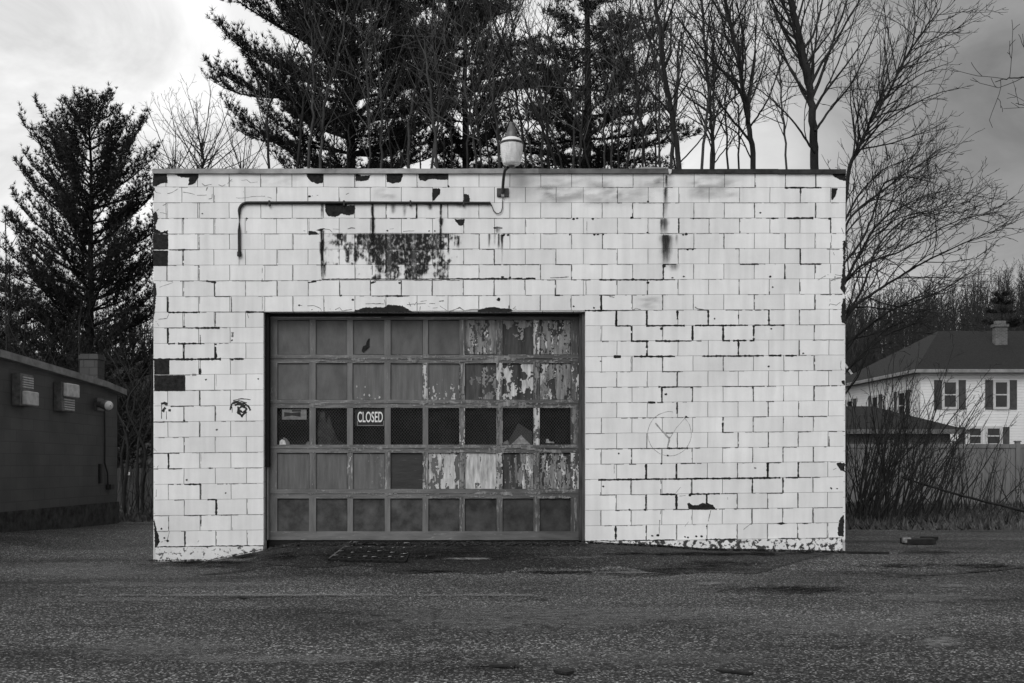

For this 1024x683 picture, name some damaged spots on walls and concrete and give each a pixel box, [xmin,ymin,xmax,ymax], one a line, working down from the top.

peeling [307,174,324,184]
peeling [386,174,403,184]
peeling [418,174,450,201]
peeling [152,174,199,266]
peeling [325,204,355,217]
water stain [661,175,670,256]
water stain [320,204,459,280]
peeling [154,359,185,391]
peeling [307,298,579,498]
peeling [687,494,716,510]